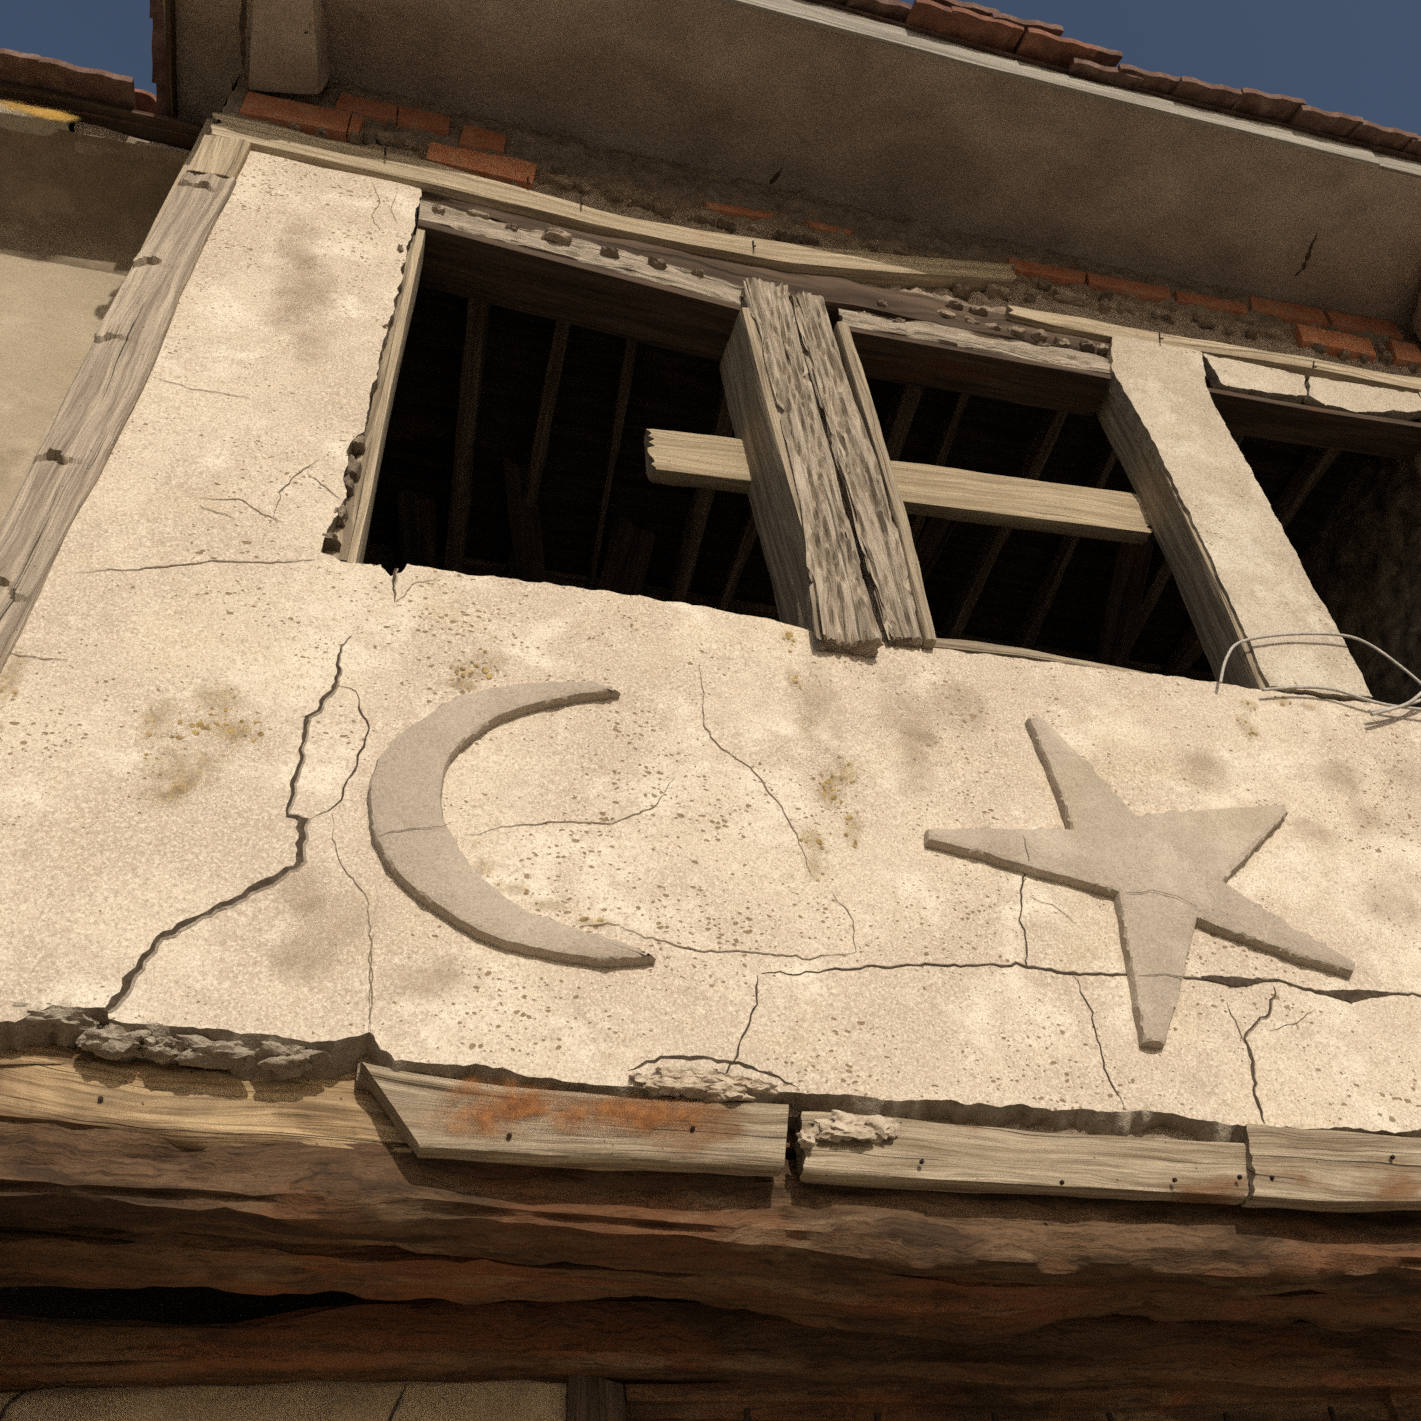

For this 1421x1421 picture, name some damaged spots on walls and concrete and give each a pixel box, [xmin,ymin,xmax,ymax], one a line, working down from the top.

crack [1295,233,1317,277]
spalling [322,235,415,562]
crack [199,459,339,523]
crack [86,559,315,573]
crack [103,635,374,1036]
crack [582,664,1331,1123]
crack [1389,990,1421,998]
spalling [13,1002,331,1078]
spalling [628,1067,778,1102]
crack [388,1384,407,1421]